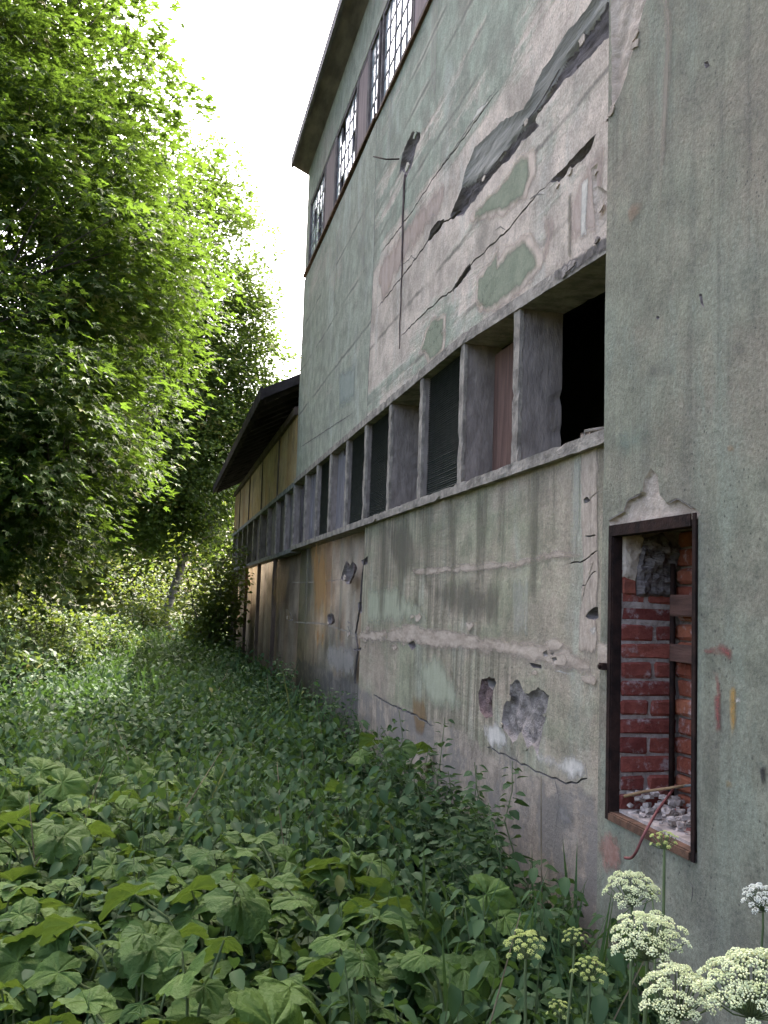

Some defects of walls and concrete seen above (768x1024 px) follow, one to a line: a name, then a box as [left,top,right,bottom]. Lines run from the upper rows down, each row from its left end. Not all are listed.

spalling [450,0,646,222]
crack [400,182,550,337]
peeling [550,134,607,279]
spalling [341,561,357,585]
crack [294,512,432,726]
damp [368,588,422,623]
damp [391,530,413,571]
peeling [347,448,700,755]
crack [570,535,596,596]
crack [486,746,587,824]